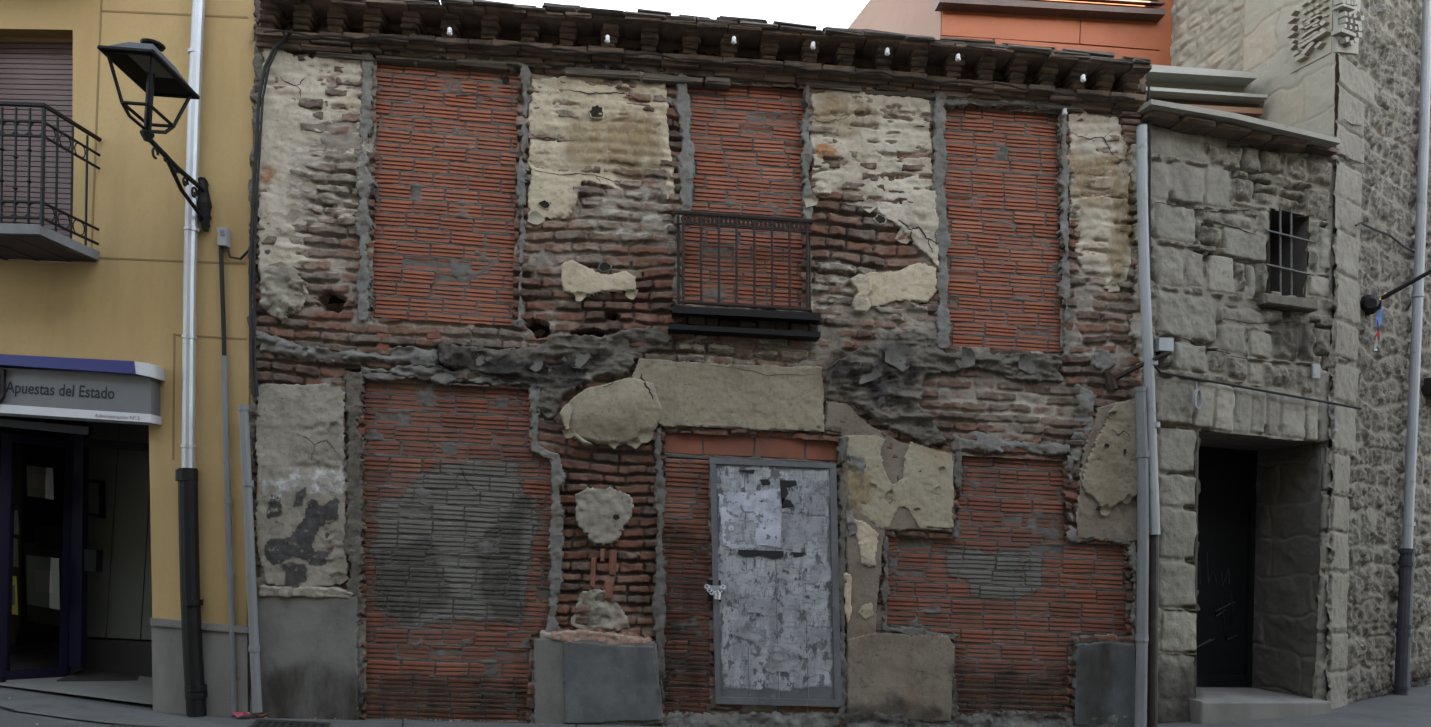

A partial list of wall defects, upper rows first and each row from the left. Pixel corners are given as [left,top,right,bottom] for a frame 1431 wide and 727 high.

flaking render [255,48,1137,722]